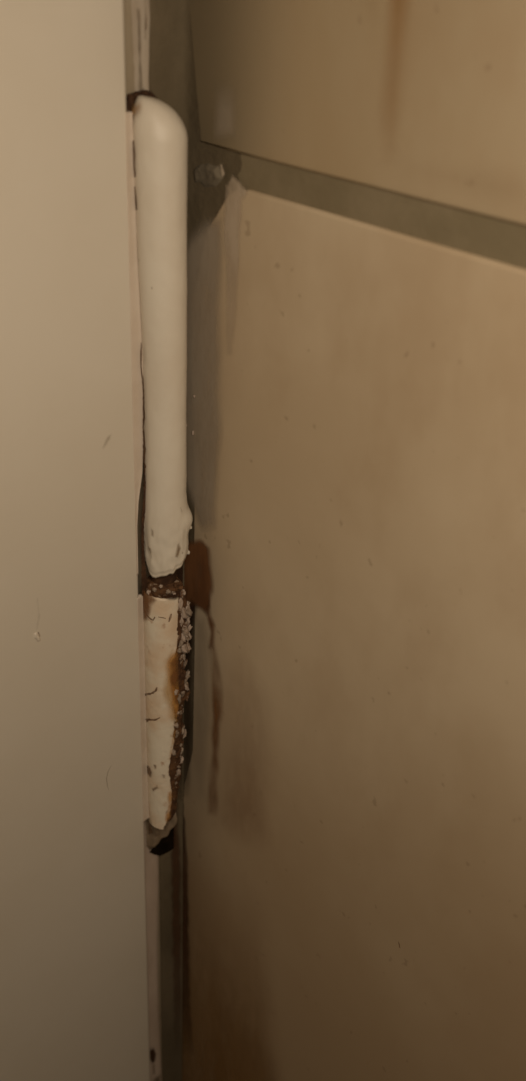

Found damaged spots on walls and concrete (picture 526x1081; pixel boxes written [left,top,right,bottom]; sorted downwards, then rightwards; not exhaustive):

peeling [146,583,193,803]
corrosion [143,541,213,714]